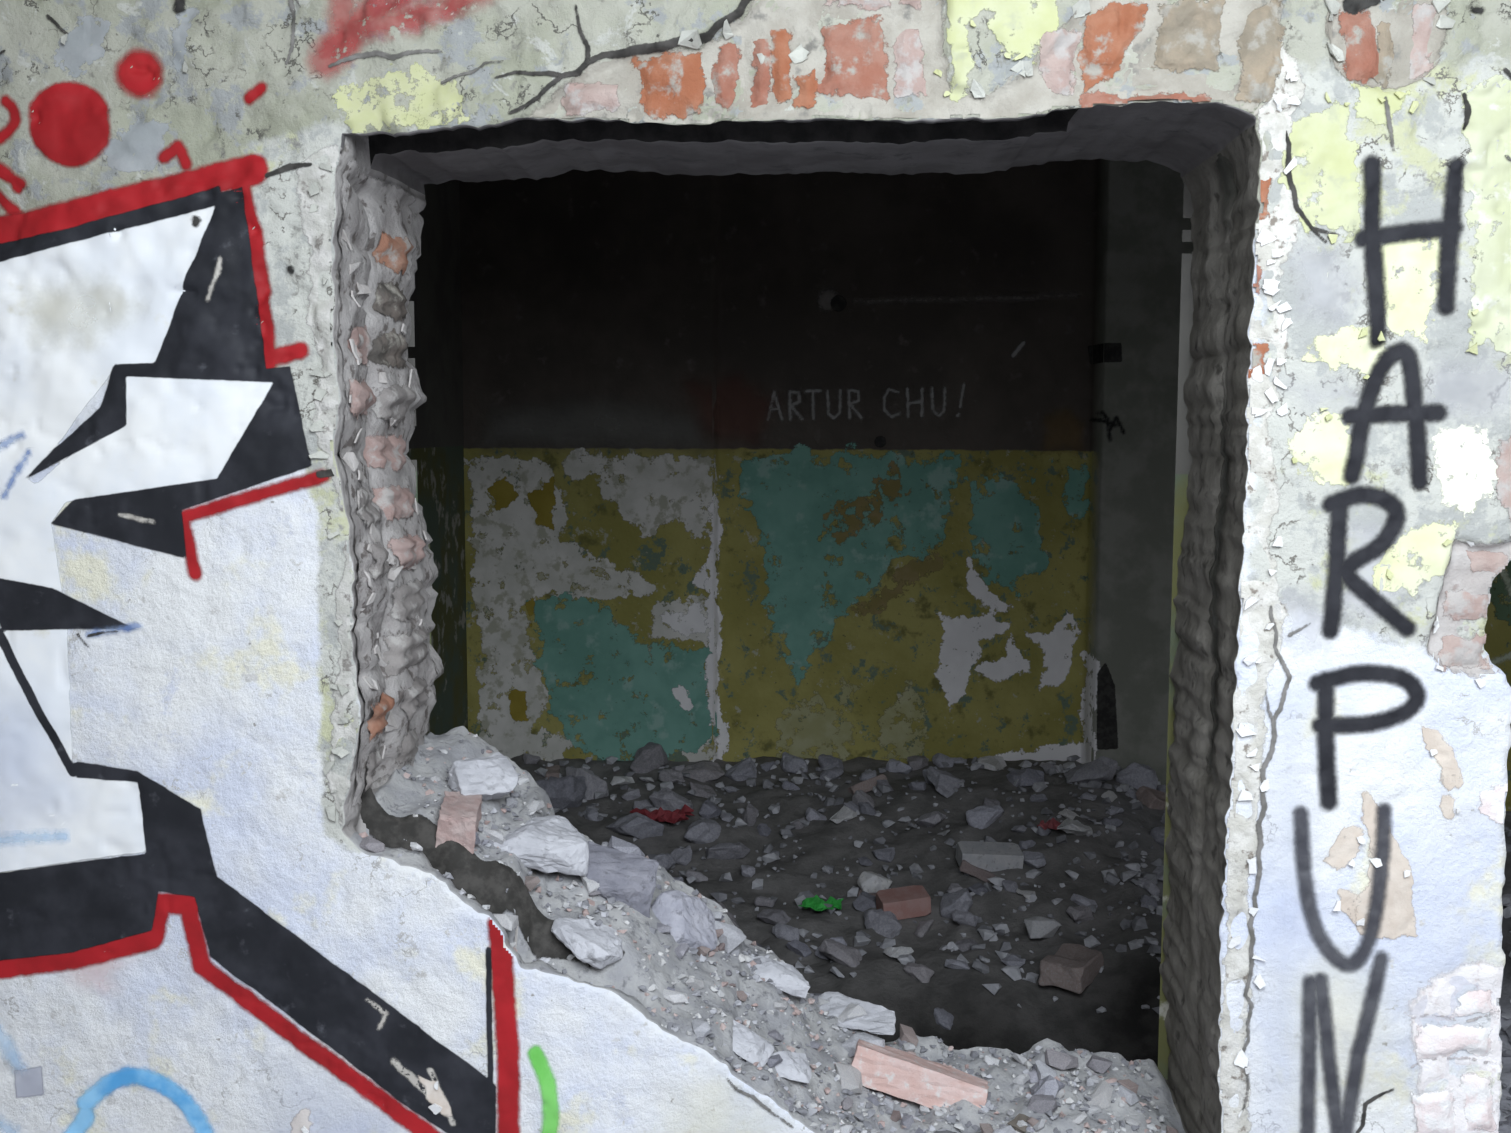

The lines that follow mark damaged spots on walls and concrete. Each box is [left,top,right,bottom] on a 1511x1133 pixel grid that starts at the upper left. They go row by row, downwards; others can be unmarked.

crack [285,0,300,65]
peeling [332,62,471,133]
crack [328,0,751,114]
spalling [296,145,439,826]
spalling [464,0,1456,1133]
spalling [1373,424,1511,688]
peeling [1422,727,1508,824]
peeling [419,1076,452,1116]
spalling [1409,959,1504,1133]